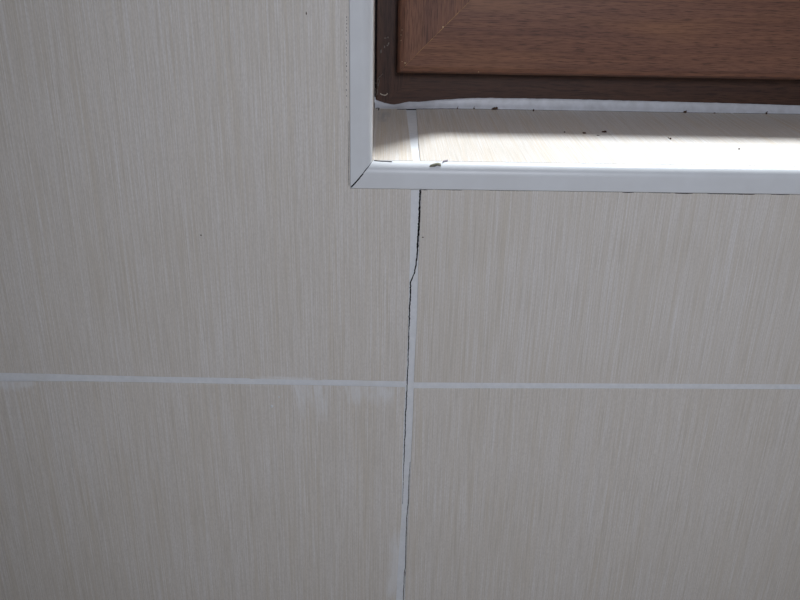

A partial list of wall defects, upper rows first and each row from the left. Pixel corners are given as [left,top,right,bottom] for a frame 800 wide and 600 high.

crack [402,189,430,600]